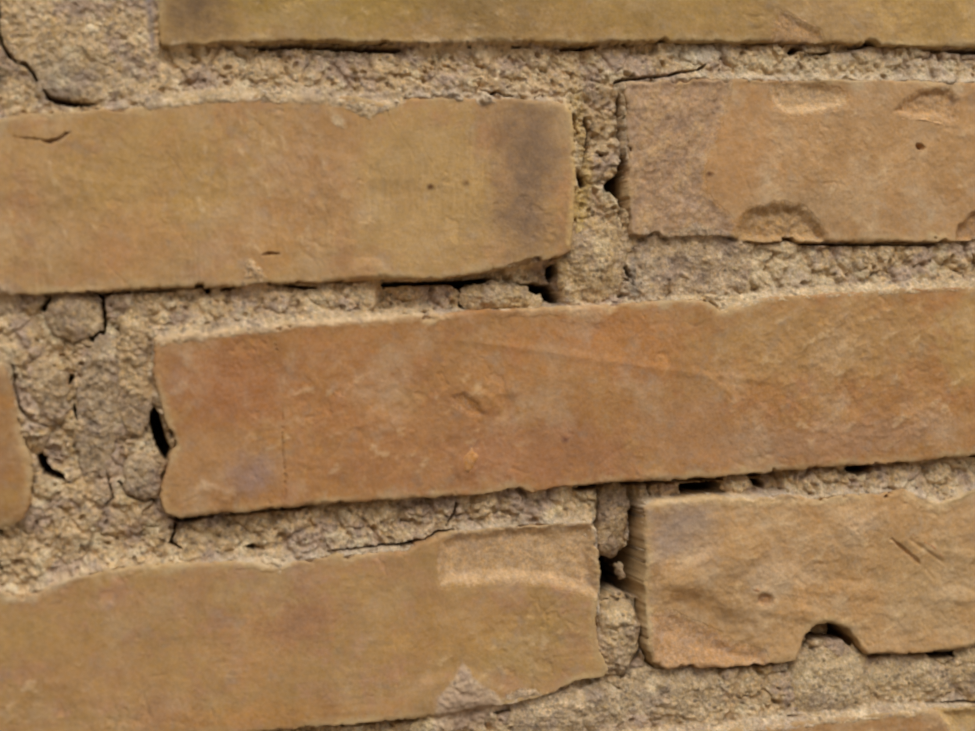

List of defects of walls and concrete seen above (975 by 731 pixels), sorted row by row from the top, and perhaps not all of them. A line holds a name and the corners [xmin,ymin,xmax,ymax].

crack [0,8,98,108]
crack [13,132,71,145]
crack [11,370,49,427]
crack [104,473,155,505]
crack [326,502,458,552]
spalling [802,629,839,650]
peeling [502,687,544,710]